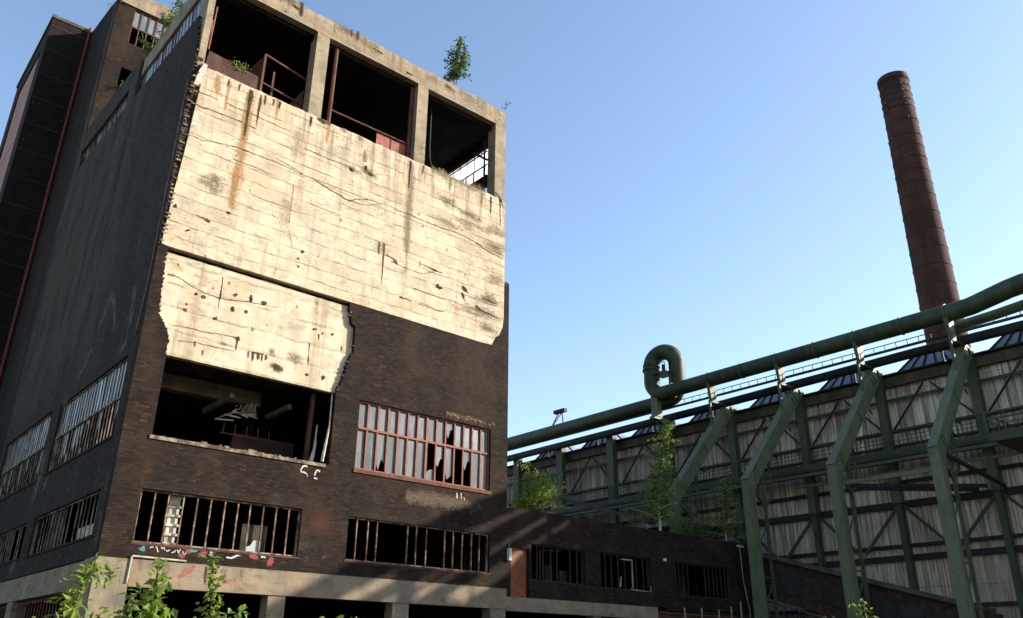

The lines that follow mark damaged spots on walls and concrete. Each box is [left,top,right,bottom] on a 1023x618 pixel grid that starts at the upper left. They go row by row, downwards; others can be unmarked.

spalling [161,19,208,241]
corrosion [231,90,254,209]
crack [181,88,504,259]
crack [173,325,237,351]
crack [167,273,277,308]
spalling [446,411,495,426]